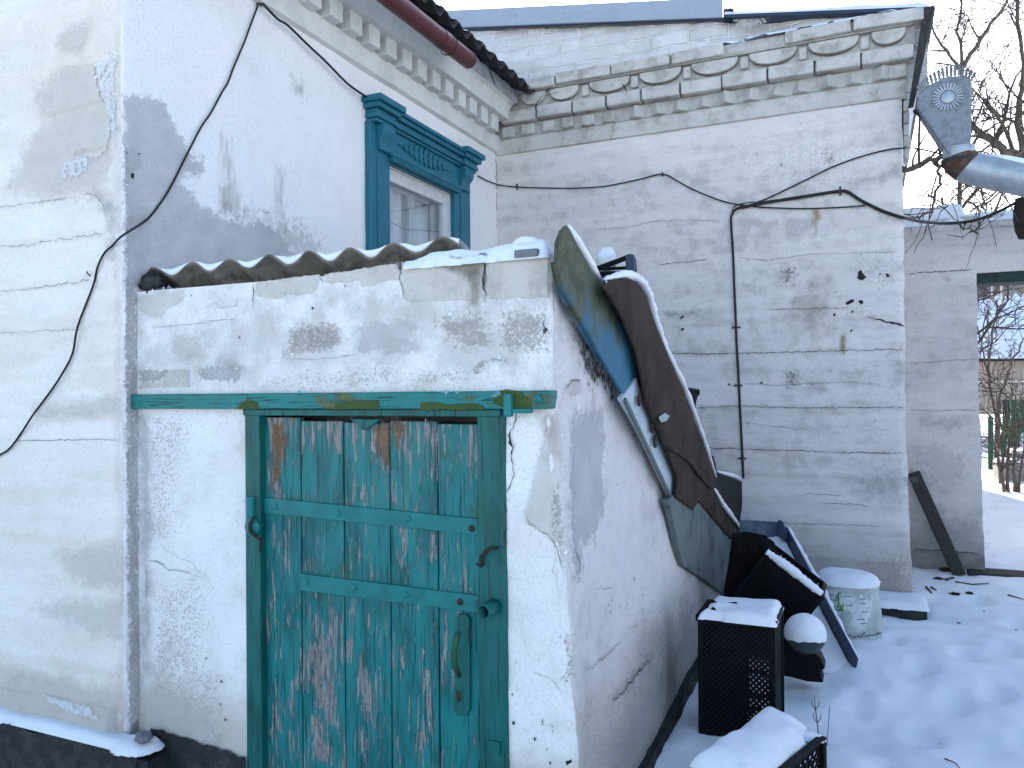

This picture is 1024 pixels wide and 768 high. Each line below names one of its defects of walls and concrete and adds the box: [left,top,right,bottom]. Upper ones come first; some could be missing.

crack [1,193,107,247]
peeling [255,256,549,374]
crack [675,307,975,364]
crack [503,415,613,598]
peeling [551,406,608,580]